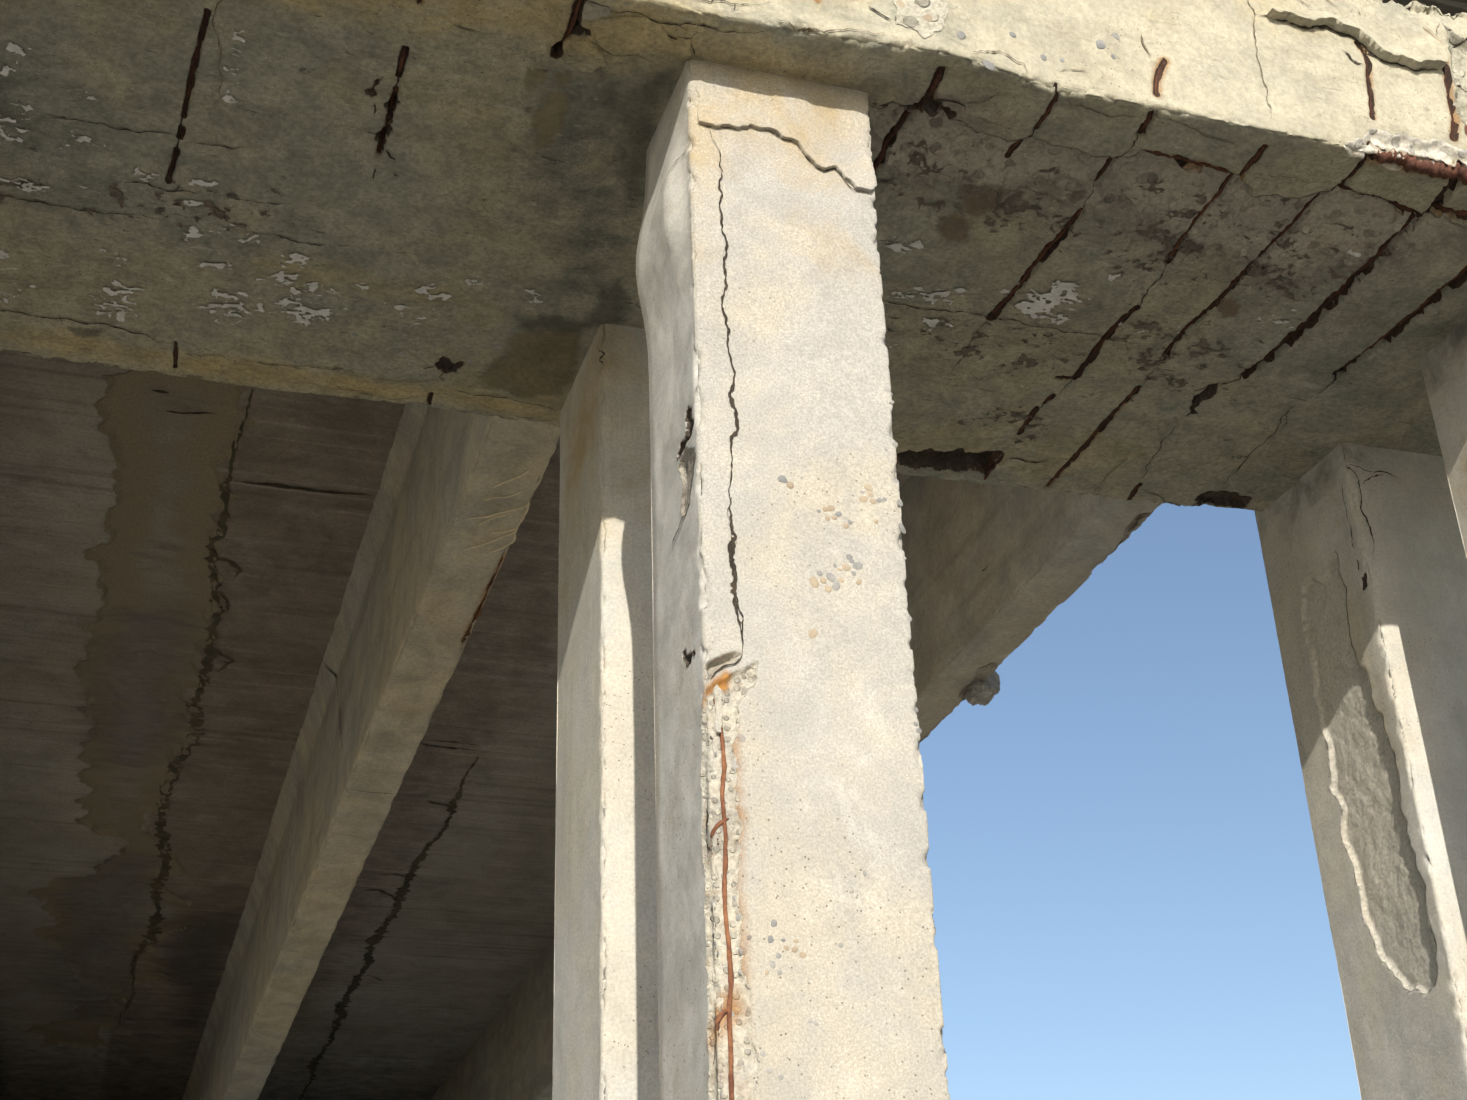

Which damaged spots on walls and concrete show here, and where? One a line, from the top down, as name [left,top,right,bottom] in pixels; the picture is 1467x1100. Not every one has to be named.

efflorescence [0,42,31,76]
peeling [550,0,691,73]
efflorescence [0,100,34,142]
efflorescence [89,249,145,330]
leakage [197,252,347,326]
spalling [696,8,1467,534]
crack [660,100,864,652]
spalling [1103,483,1154,560]
crack [0,310,556,1025]
corrosion [707,672,731,695]
spalling [683,650,784,1100]
crack [298,739,478,1100]